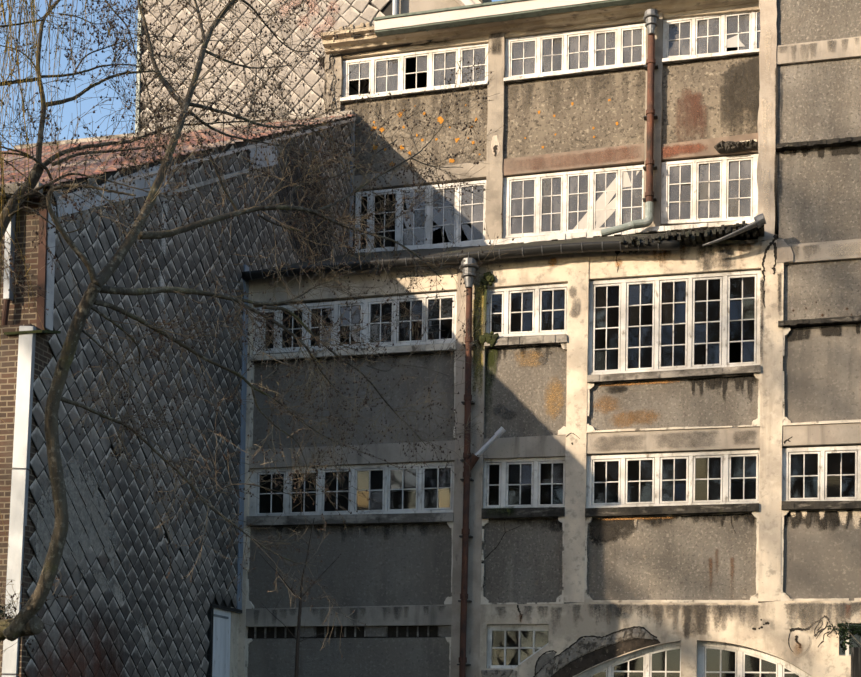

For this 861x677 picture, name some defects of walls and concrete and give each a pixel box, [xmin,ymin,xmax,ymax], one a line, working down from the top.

leakage [663,53,778,135]
crack [762,234,778,307]
leakage [472,278,561,419]
leakage [594,373,757,400]
leakage [784,509,861,529]
leakage [573,604,758,635]